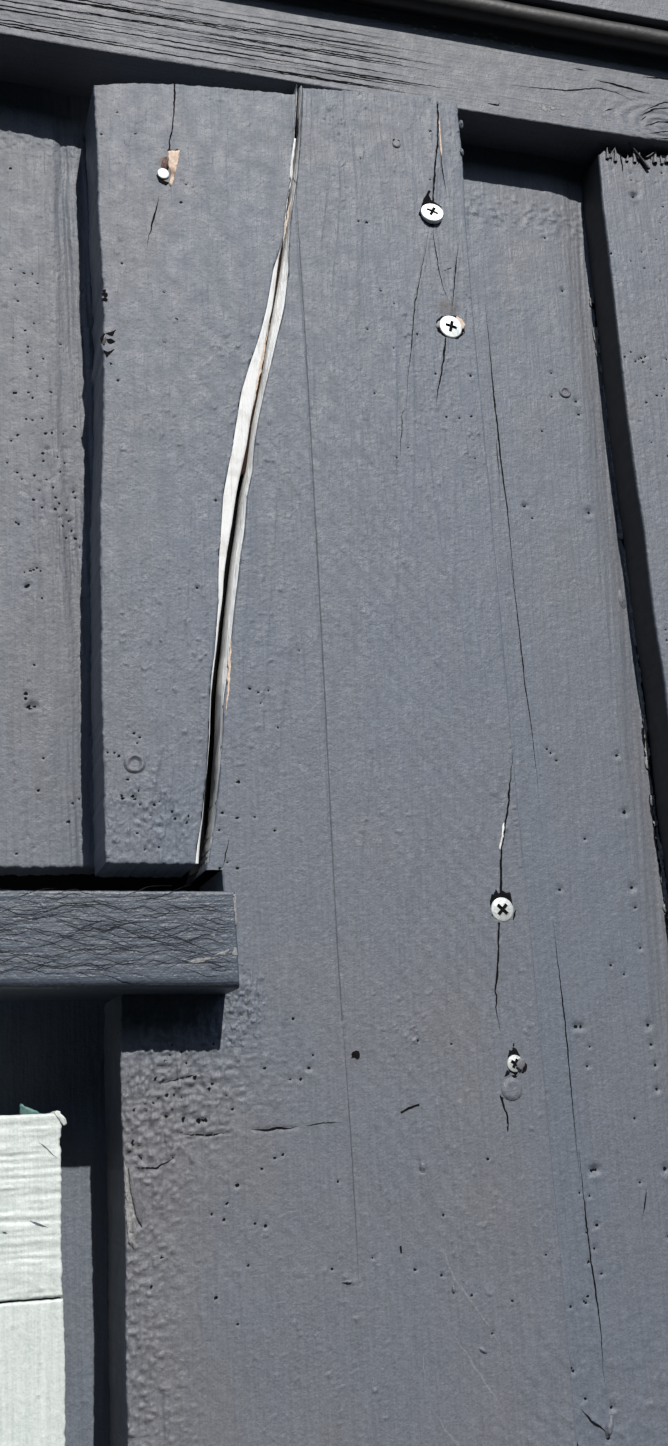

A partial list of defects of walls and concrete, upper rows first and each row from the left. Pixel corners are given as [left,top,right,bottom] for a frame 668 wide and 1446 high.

peeling [156,149,187,204]
crack [0,0,538,1028]
crack [500,1095,509,1131]